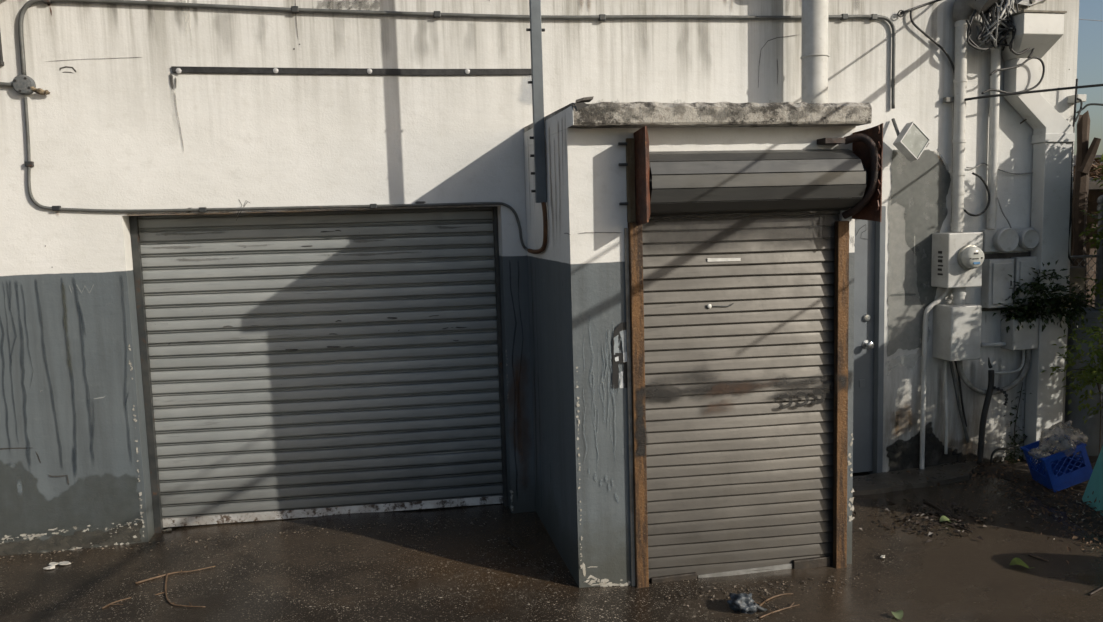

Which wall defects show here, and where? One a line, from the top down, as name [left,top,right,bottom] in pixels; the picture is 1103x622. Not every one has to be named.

spalling [575,96,594,111]
water stain [0,280,138,541]
peeling [0,405,145,556]